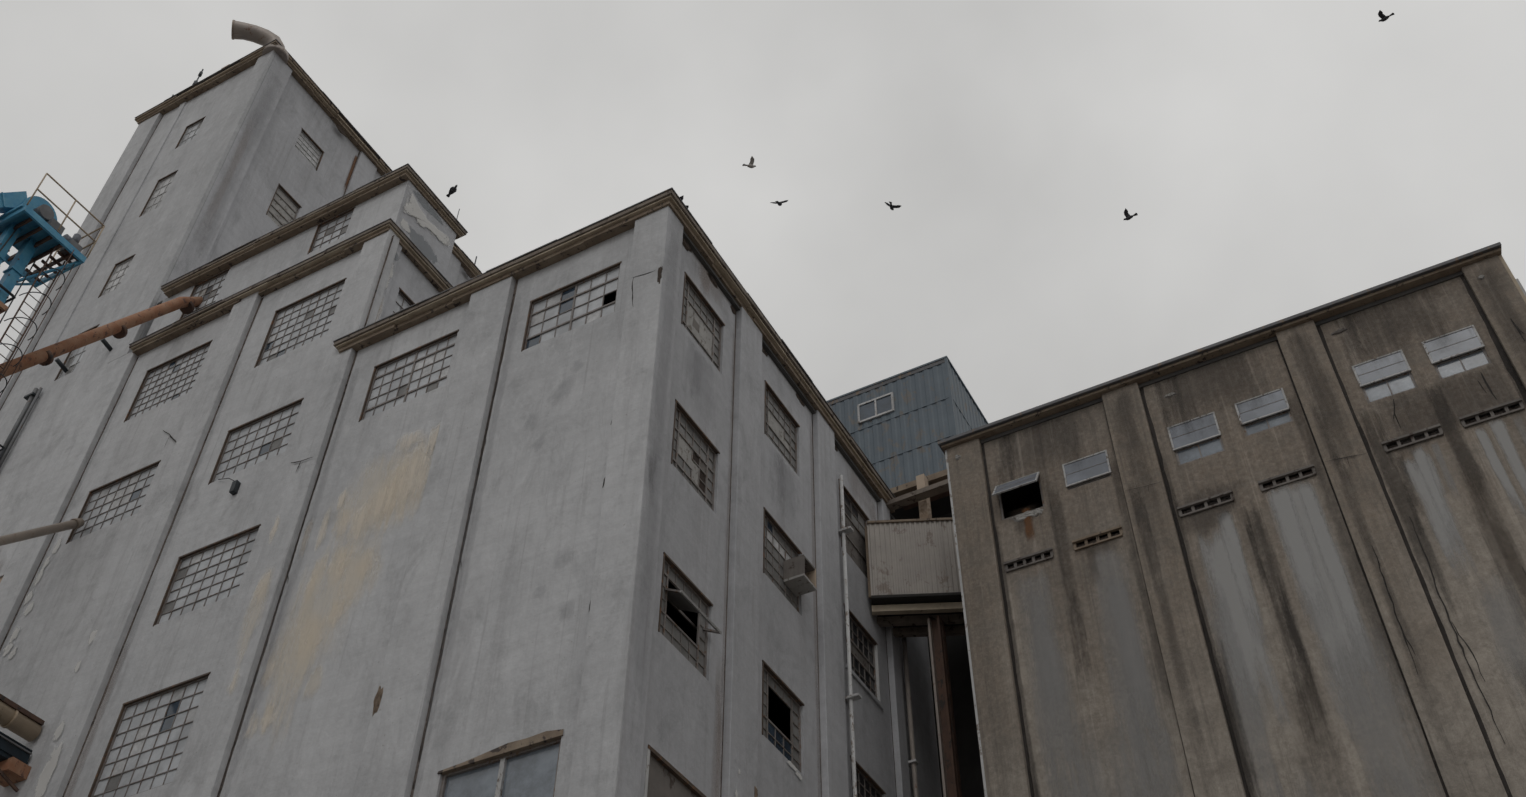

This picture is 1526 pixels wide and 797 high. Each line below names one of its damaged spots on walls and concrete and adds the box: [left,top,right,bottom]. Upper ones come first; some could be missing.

water stain [1406,449,1464,557]
water stain [1476,420,1526,512]
water stain [1199,513,1283,708]
water stain [1271,485,1377,717]
crack [1371,545,1418,674]
crack [1409,517,1505,744]